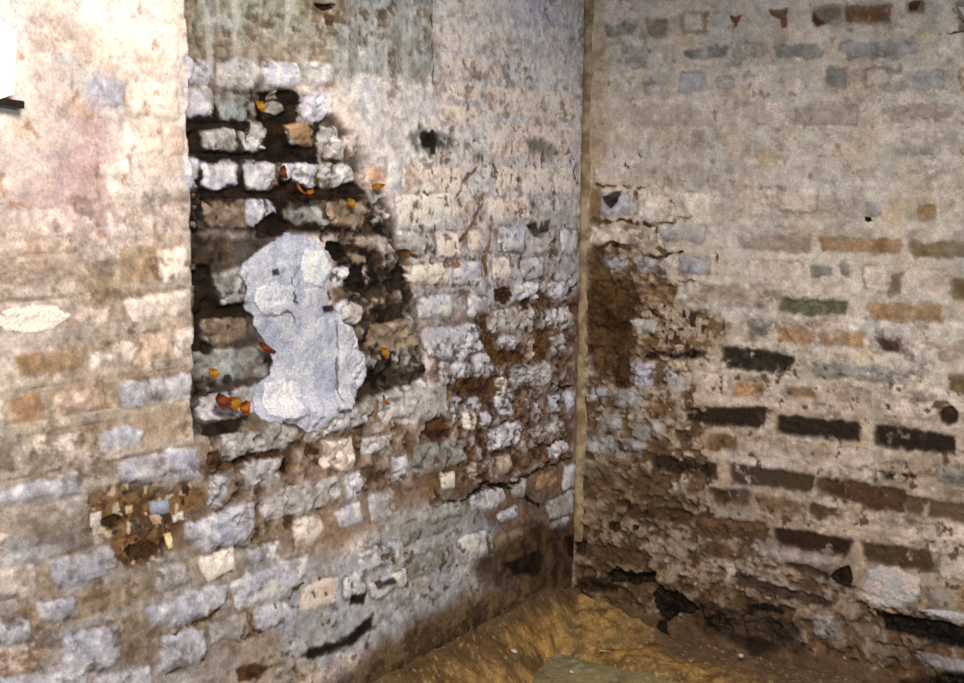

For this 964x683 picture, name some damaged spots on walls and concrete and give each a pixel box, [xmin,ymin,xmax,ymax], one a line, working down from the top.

spalling [186,90,319,164]
spalling [198,178,365,237]
damp [590,189,600,222]
spalling [192,263,251,355]
spalling [325,241,426,400]
damp [587,248,639,387]
spalling [201,418,242,437]
crack [434,433,572,507]
spalling [88,483,202,569]
damp [657,620,670,635]
damp [695,601,801,654]
damp [903,672,964,683]